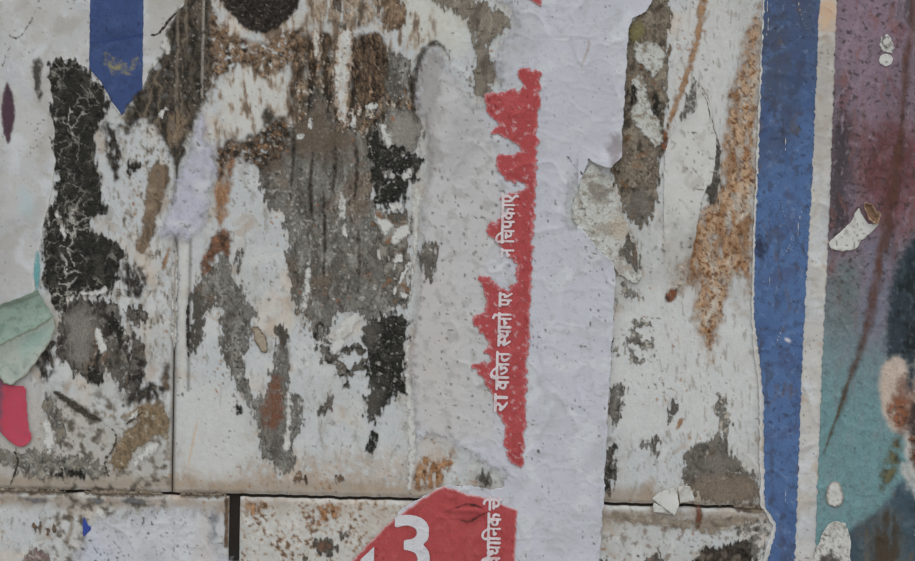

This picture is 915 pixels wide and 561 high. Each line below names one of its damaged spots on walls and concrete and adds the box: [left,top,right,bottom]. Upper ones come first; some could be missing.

peeling [55,211,67,238]
peeling [71,286,108,296]
spalling [170,244,308,485]
spalling [258,0,442,354]
peeling [404,345,416,490]
spalling [610,0,716,262]
corrosion [661,0,708,151]
spalling [607,392,770,561]
corrosion [665,15,760,351]
corrosion [825,291,876,450]